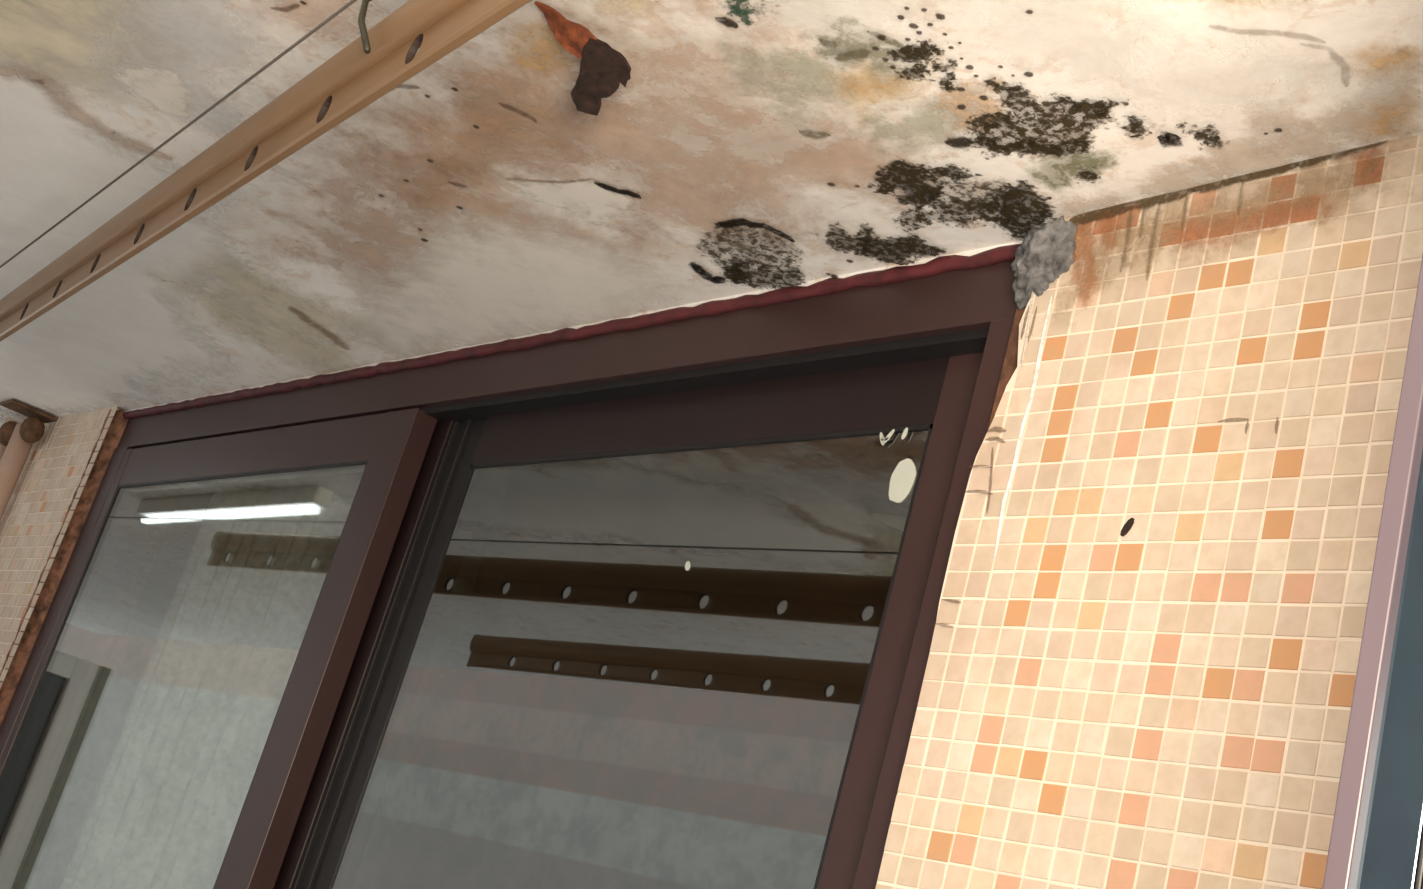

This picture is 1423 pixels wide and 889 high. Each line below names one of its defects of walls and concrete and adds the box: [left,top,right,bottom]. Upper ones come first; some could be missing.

water stain [0,0,162,84]
water stain [715,0,777,28]
peeling [303,0,900,359]
water stain [740,7,1416,285]
water stain [689,218,806,290]
water stain [210,268,349,372]